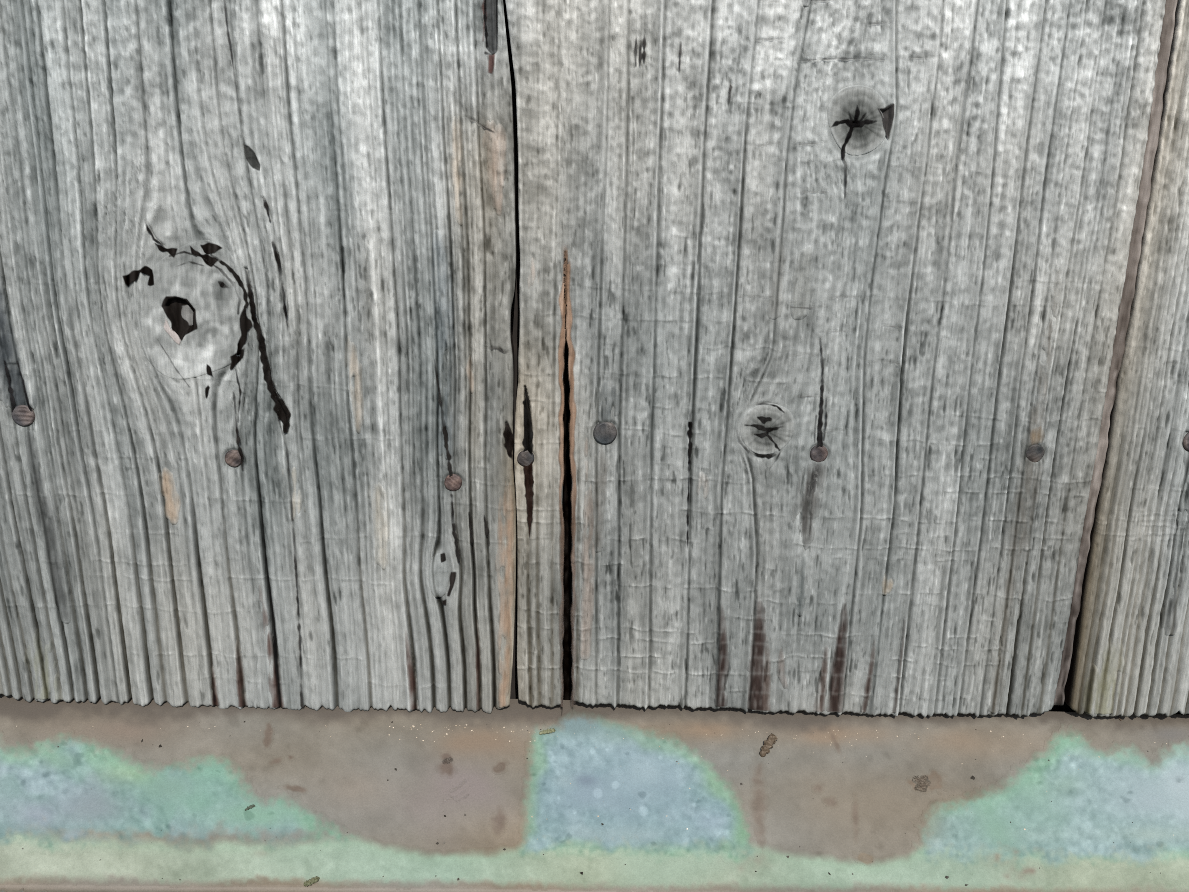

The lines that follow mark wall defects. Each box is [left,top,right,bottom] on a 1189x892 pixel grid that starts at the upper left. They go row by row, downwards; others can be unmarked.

crack [224,4,233,64]
crack [833,106,876,192]
crack [146,199,291,472]
crack [503,252,577,709]
crack [291,506,304,707]